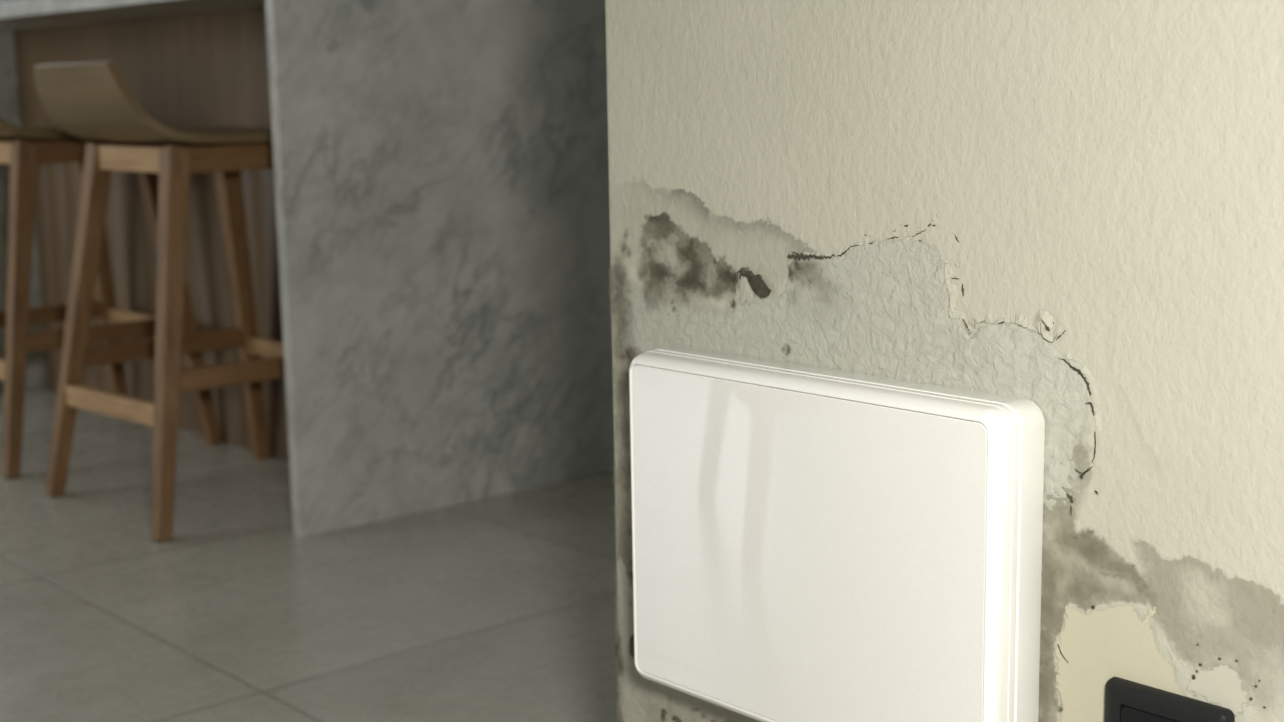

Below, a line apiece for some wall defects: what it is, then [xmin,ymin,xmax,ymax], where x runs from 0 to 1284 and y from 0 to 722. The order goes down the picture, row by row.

water stain [610,212,739,361]
water stain [788,259,815,280]
flaking render [622,239,1087,509]
water stain [1038,509,1284,722]